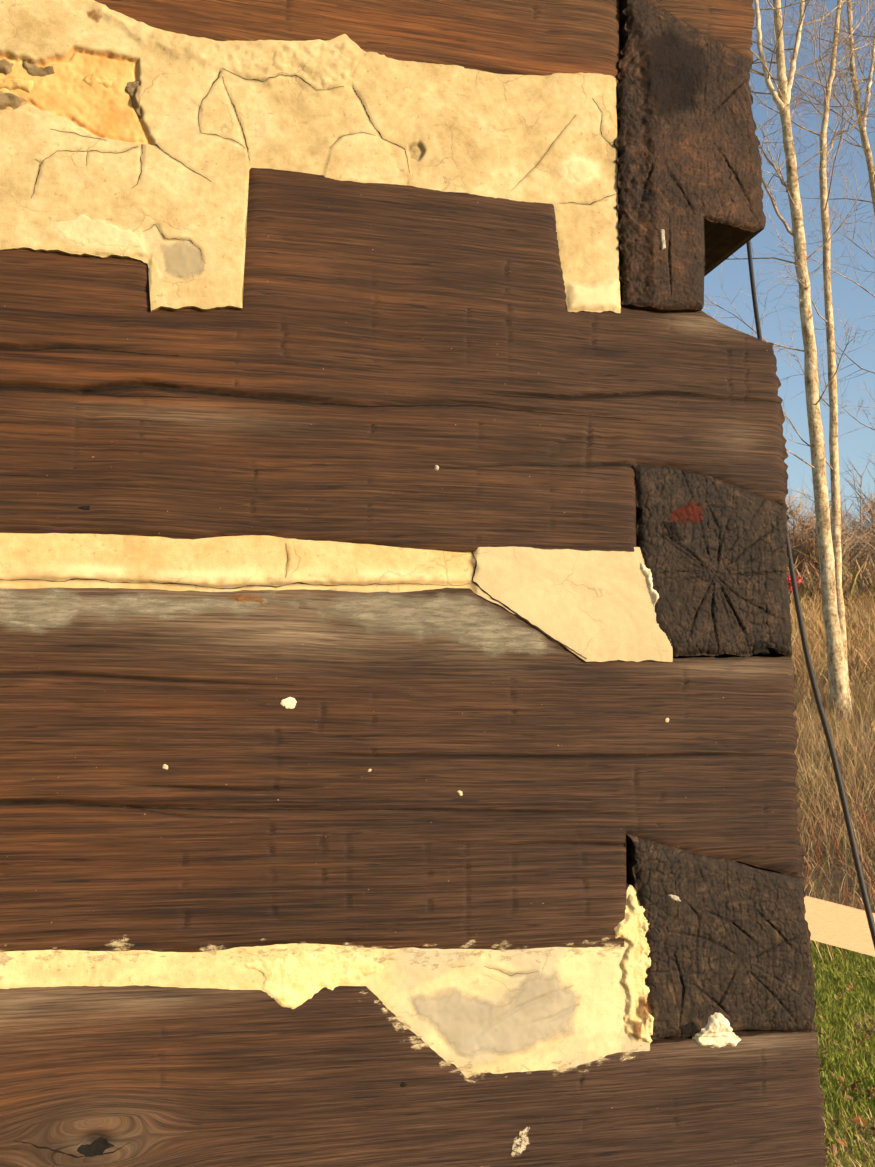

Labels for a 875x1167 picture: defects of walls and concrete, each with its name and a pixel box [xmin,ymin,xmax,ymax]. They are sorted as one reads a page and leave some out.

spalling [0,49,148,144]
crack [31,129,212,198]
crack [198,68,410,172]
crack [513,99,614,189]
water stain [0,588,265,630]
water stain [332,595,546,653]